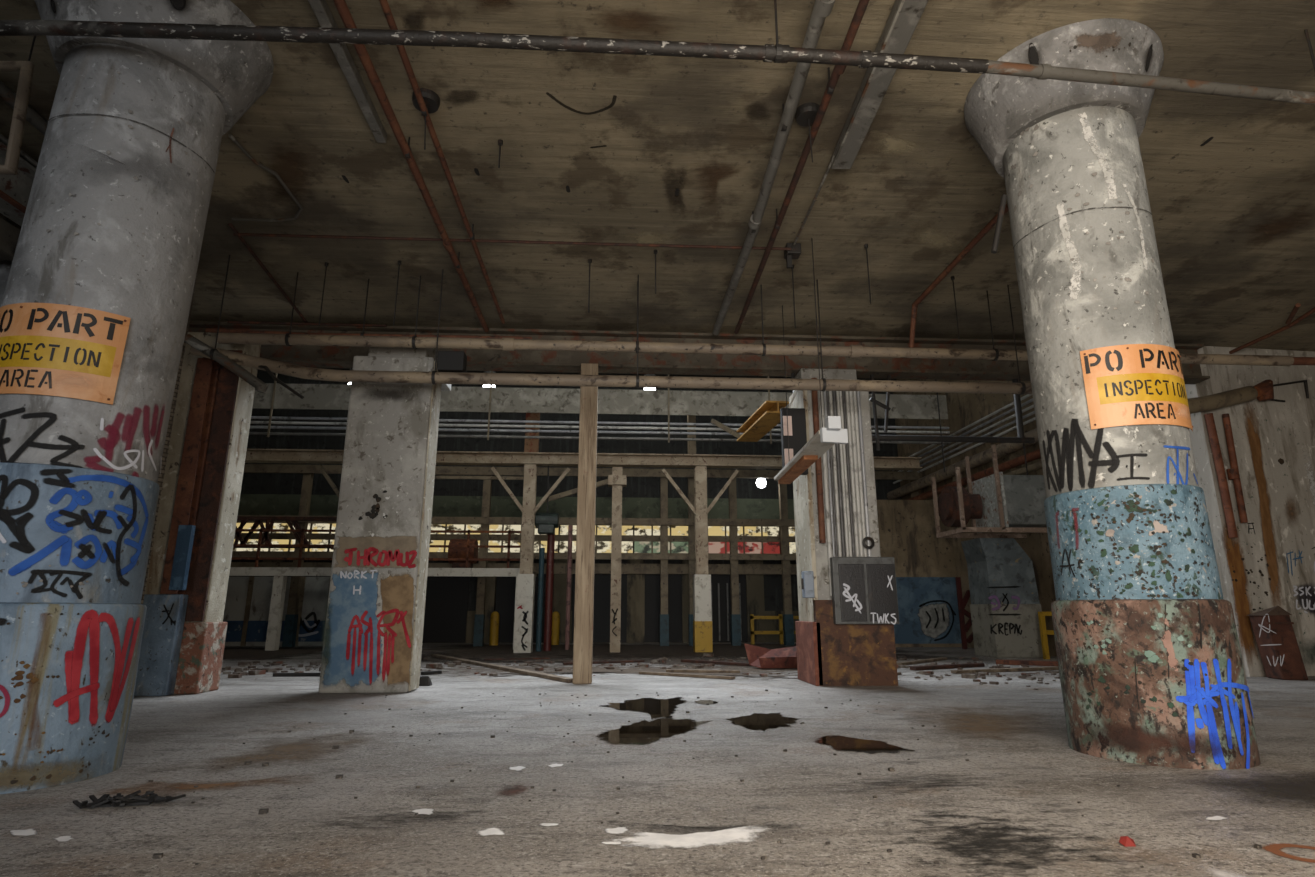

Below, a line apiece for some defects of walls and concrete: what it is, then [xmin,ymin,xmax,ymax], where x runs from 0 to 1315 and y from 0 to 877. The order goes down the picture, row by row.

leakage [699,166,735,197]
peeling [1056,489,1216,717]
corrosion [1222,527,1256,656]
corrosion [1092,723,1216,754]